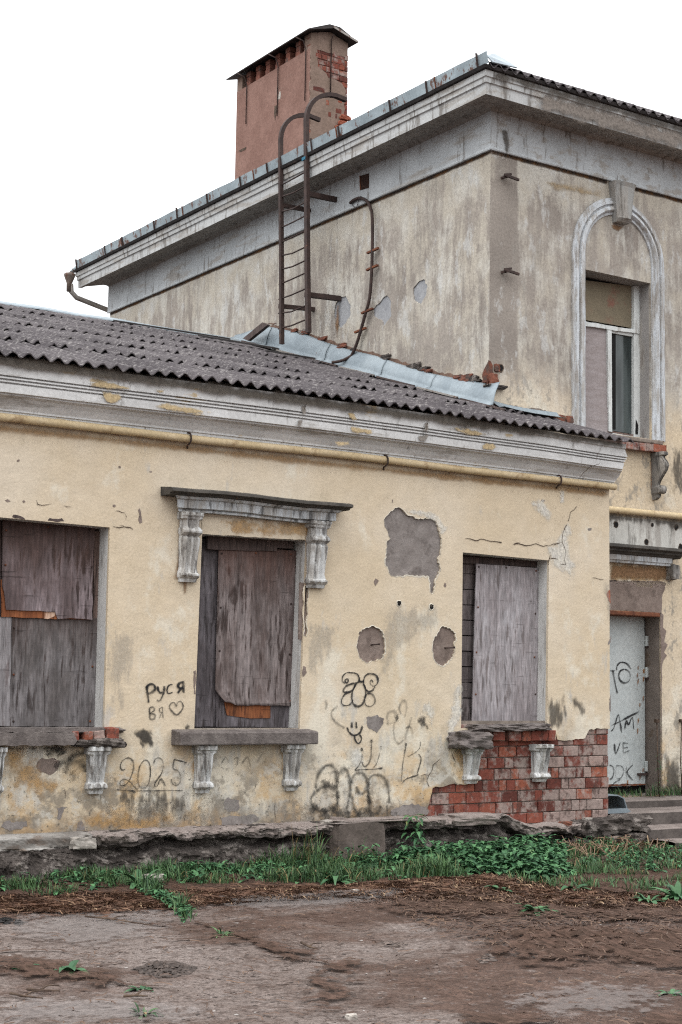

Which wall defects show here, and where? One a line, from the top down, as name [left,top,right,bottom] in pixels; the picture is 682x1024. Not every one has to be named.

flaking render [313,50,351,128]
flaking render [335,297,351,328]
crack [465,445,603,565]
flaking render [374,500,446,611]
flaking render [356,625,386,664]
flaking render [432,626,457,667]
damp [122,791,184,817]
flaking render [391,728,609,824]